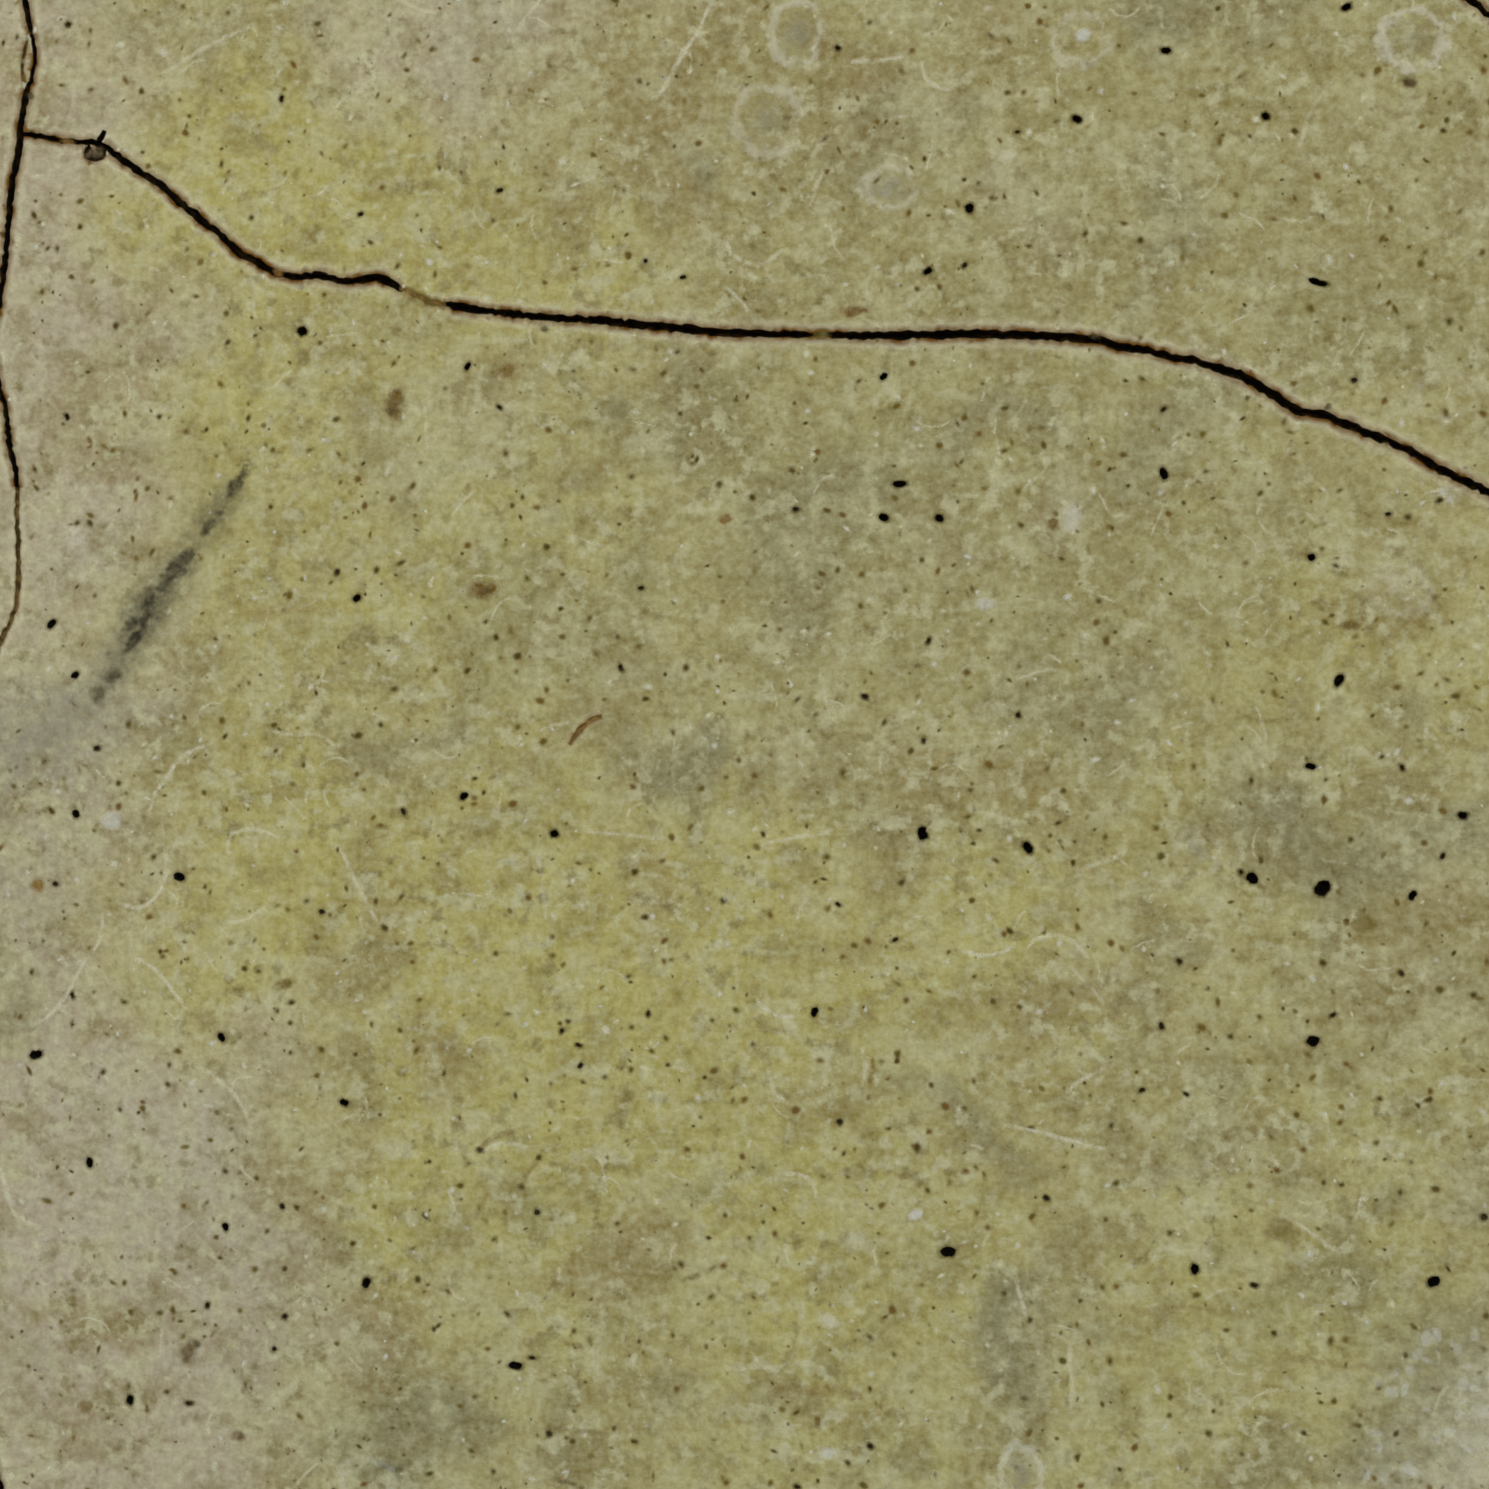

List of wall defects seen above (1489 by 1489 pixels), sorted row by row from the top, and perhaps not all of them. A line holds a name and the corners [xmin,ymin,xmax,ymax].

crack [0,0,1489,497]
crack [0,378,23,647]